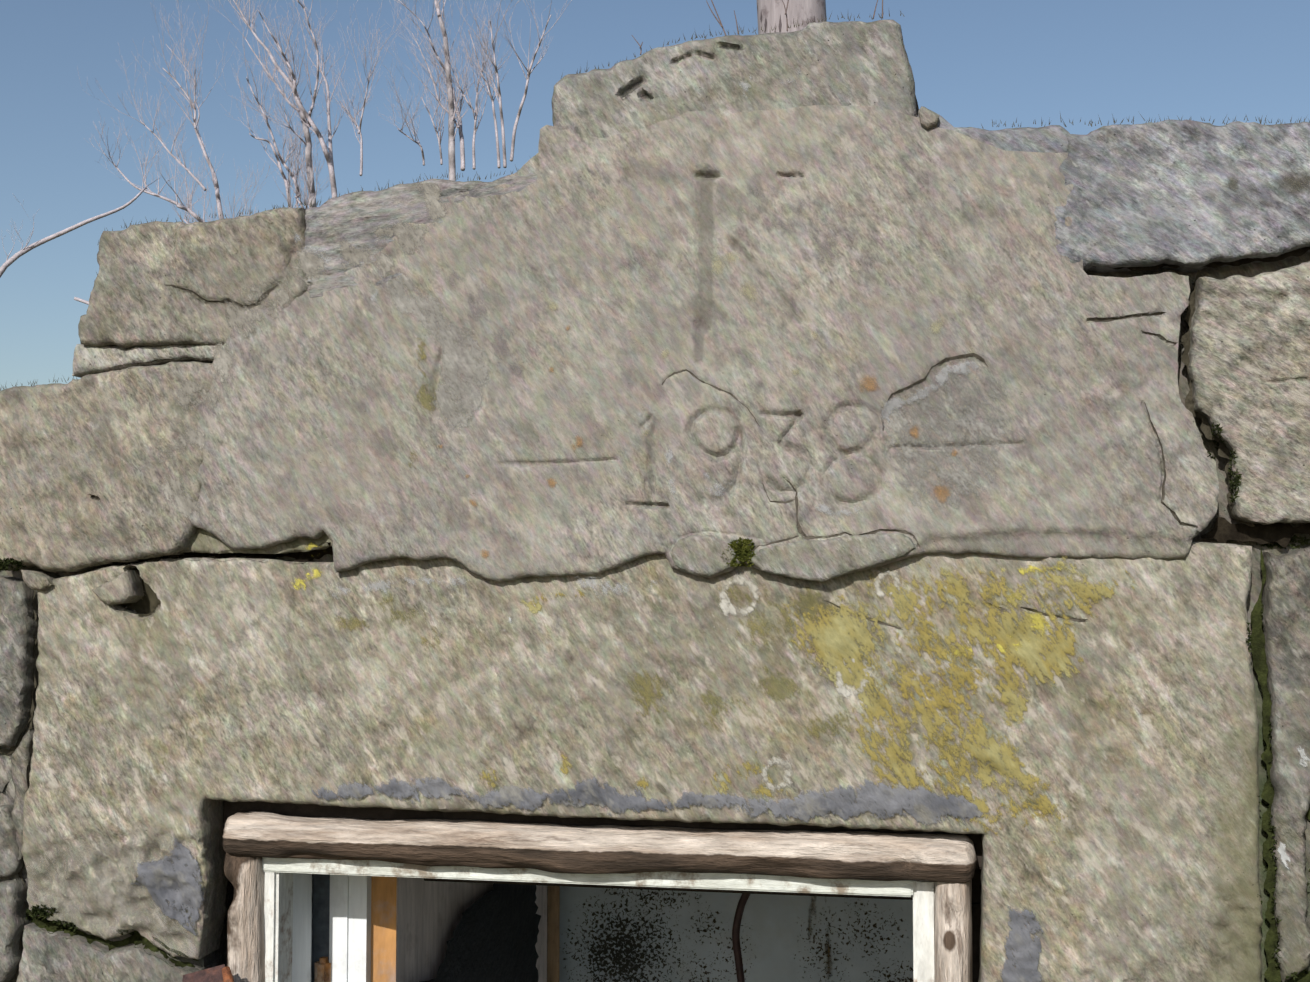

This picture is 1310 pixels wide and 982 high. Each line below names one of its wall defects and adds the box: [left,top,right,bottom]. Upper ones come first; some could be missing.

crack [164,284,277,307]
crack [662,369,759,425]
crack [887,353,987,402]
crack [752,480,920,552]
spalling [92,568,161,617]
crack [1089,247,1310,982]
water stain [560,888,752,982]
water stain [794,896,914,982]